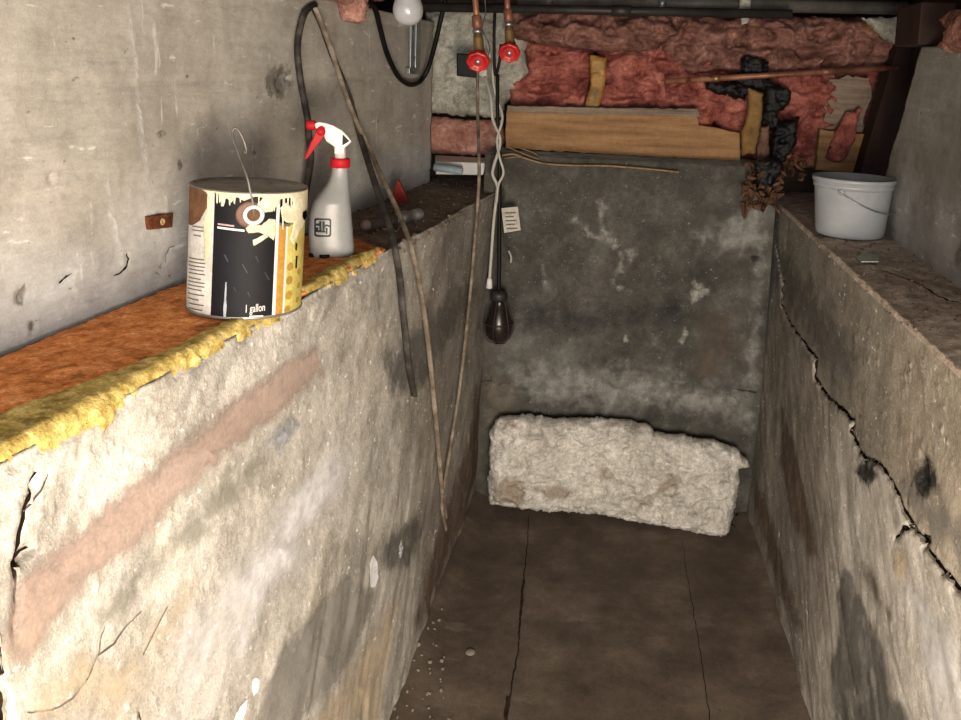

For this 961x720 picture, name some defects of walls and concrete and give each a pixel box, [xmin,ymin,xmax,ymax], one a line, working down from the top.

leakage [691,284,709,302]
leakage [721,200,767,249]
crack [776,244,961,593]
crack [0,472,168,720]
crack [503,515,529,720]